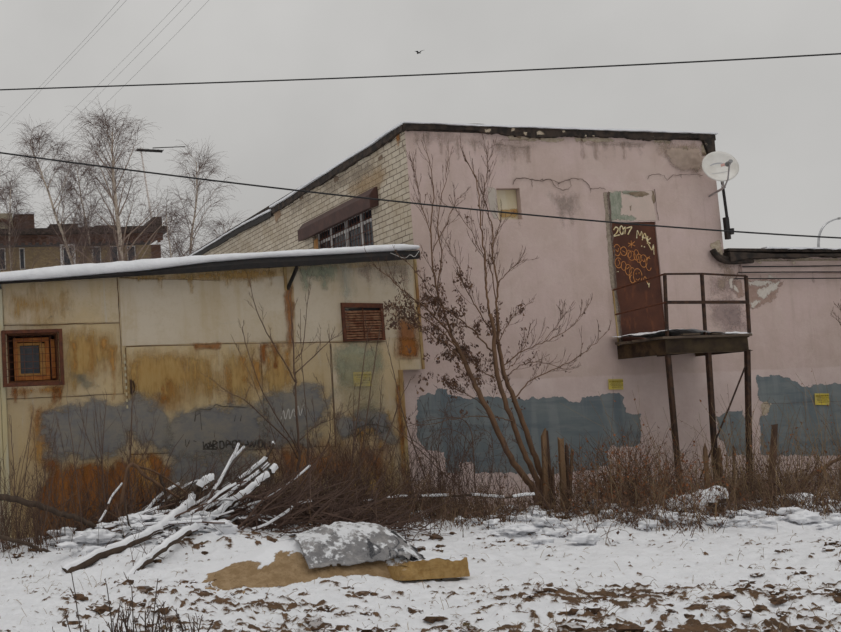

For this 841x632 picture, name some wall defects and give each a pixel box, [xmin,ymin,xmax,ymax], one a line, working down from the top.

peeling [609,190,656,221]
crack [648,174,702,220]
crack [513,178,623,341]
corrosion [12,331,116,402]
corrosion [284,287,294,349]
corrosion [398,319,418,357]
peeling [729,275,784,312]
corrosion [33,454,171,535]